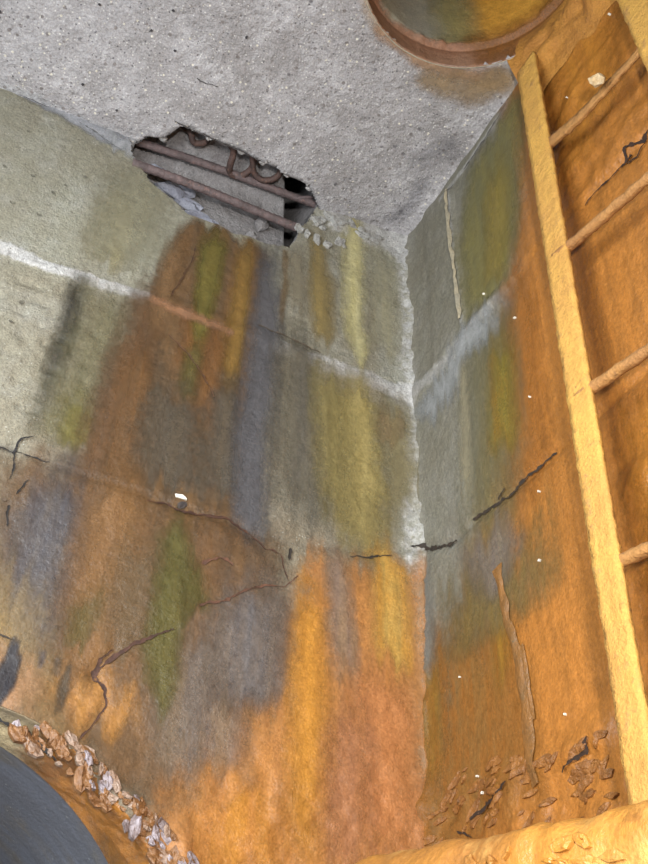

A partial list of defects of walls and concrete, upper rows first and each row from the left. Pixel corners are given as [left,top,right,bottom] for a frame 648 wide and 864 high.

spalling [131,126,384,249]
crack [585,130,648,205]
crack [0,436,49,526]
corrosion [77,219,266,548]
corrosion [158,0,648,864]
crack [473,452,557,520]
crack [411,540,457,551]
crack [0,718,57,761]
corrosion [27,736,160,864]
peeling [8,719,199,864]
crack [79,629,173,740]
spalling [423,730,620,846]